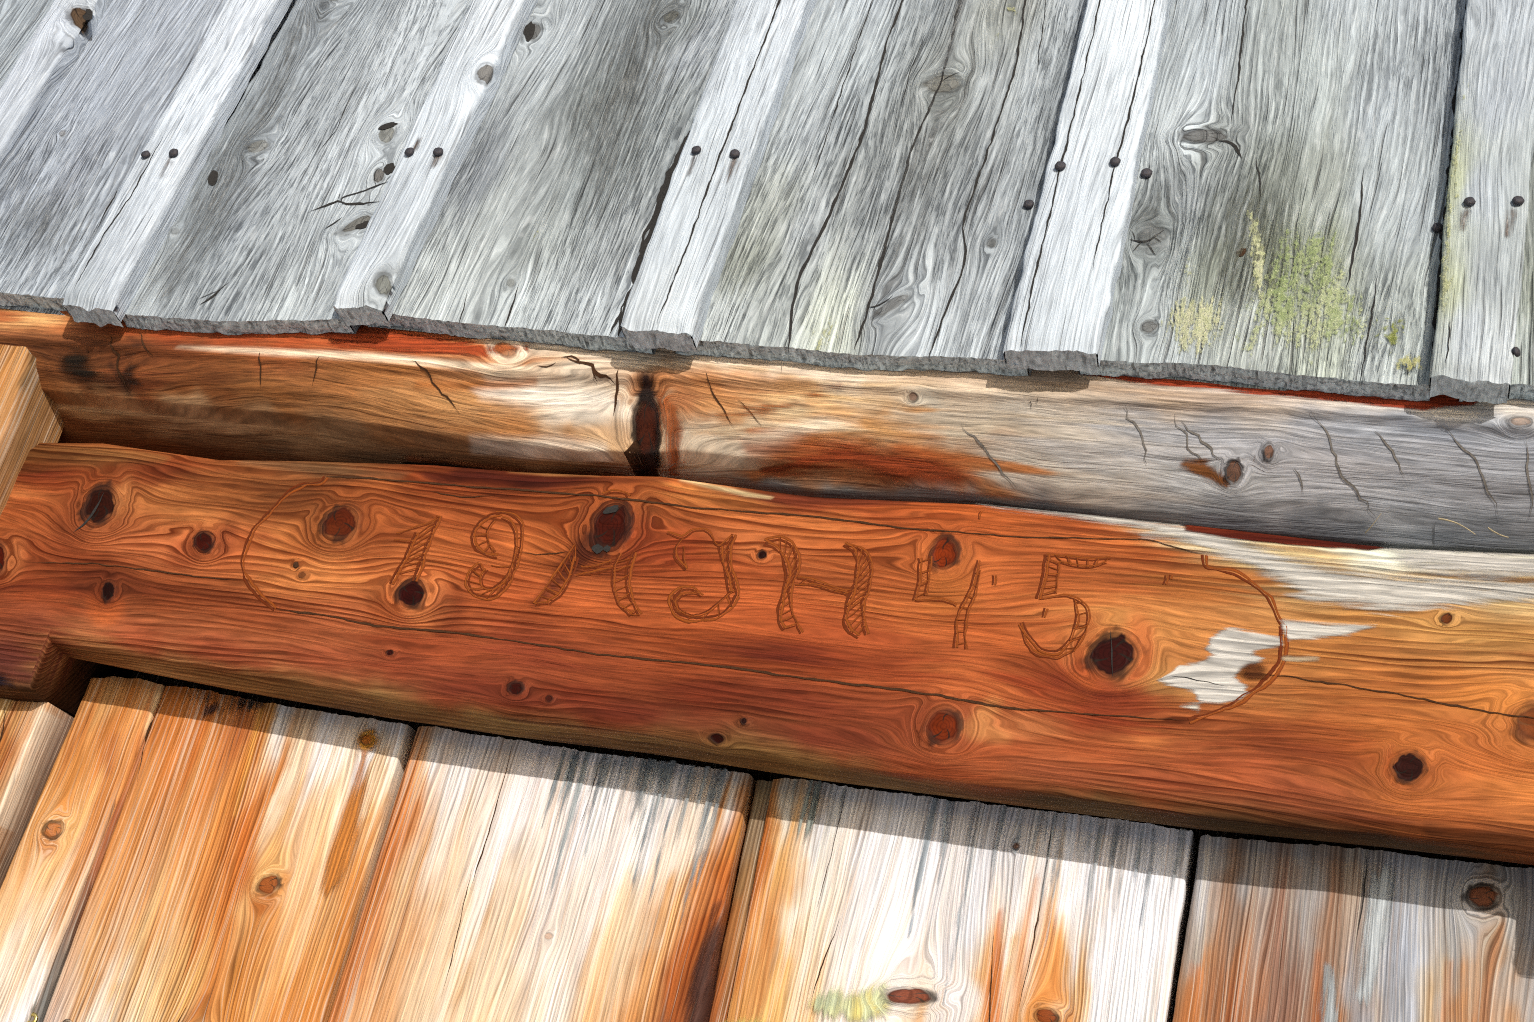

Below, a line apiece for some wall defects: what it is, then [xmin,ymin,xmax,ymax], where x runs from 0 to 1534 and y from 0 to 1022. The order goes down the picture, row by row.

crack [788,0,962,353]
crack [929,0,1046,356]
crack [1265,674,1534,718]